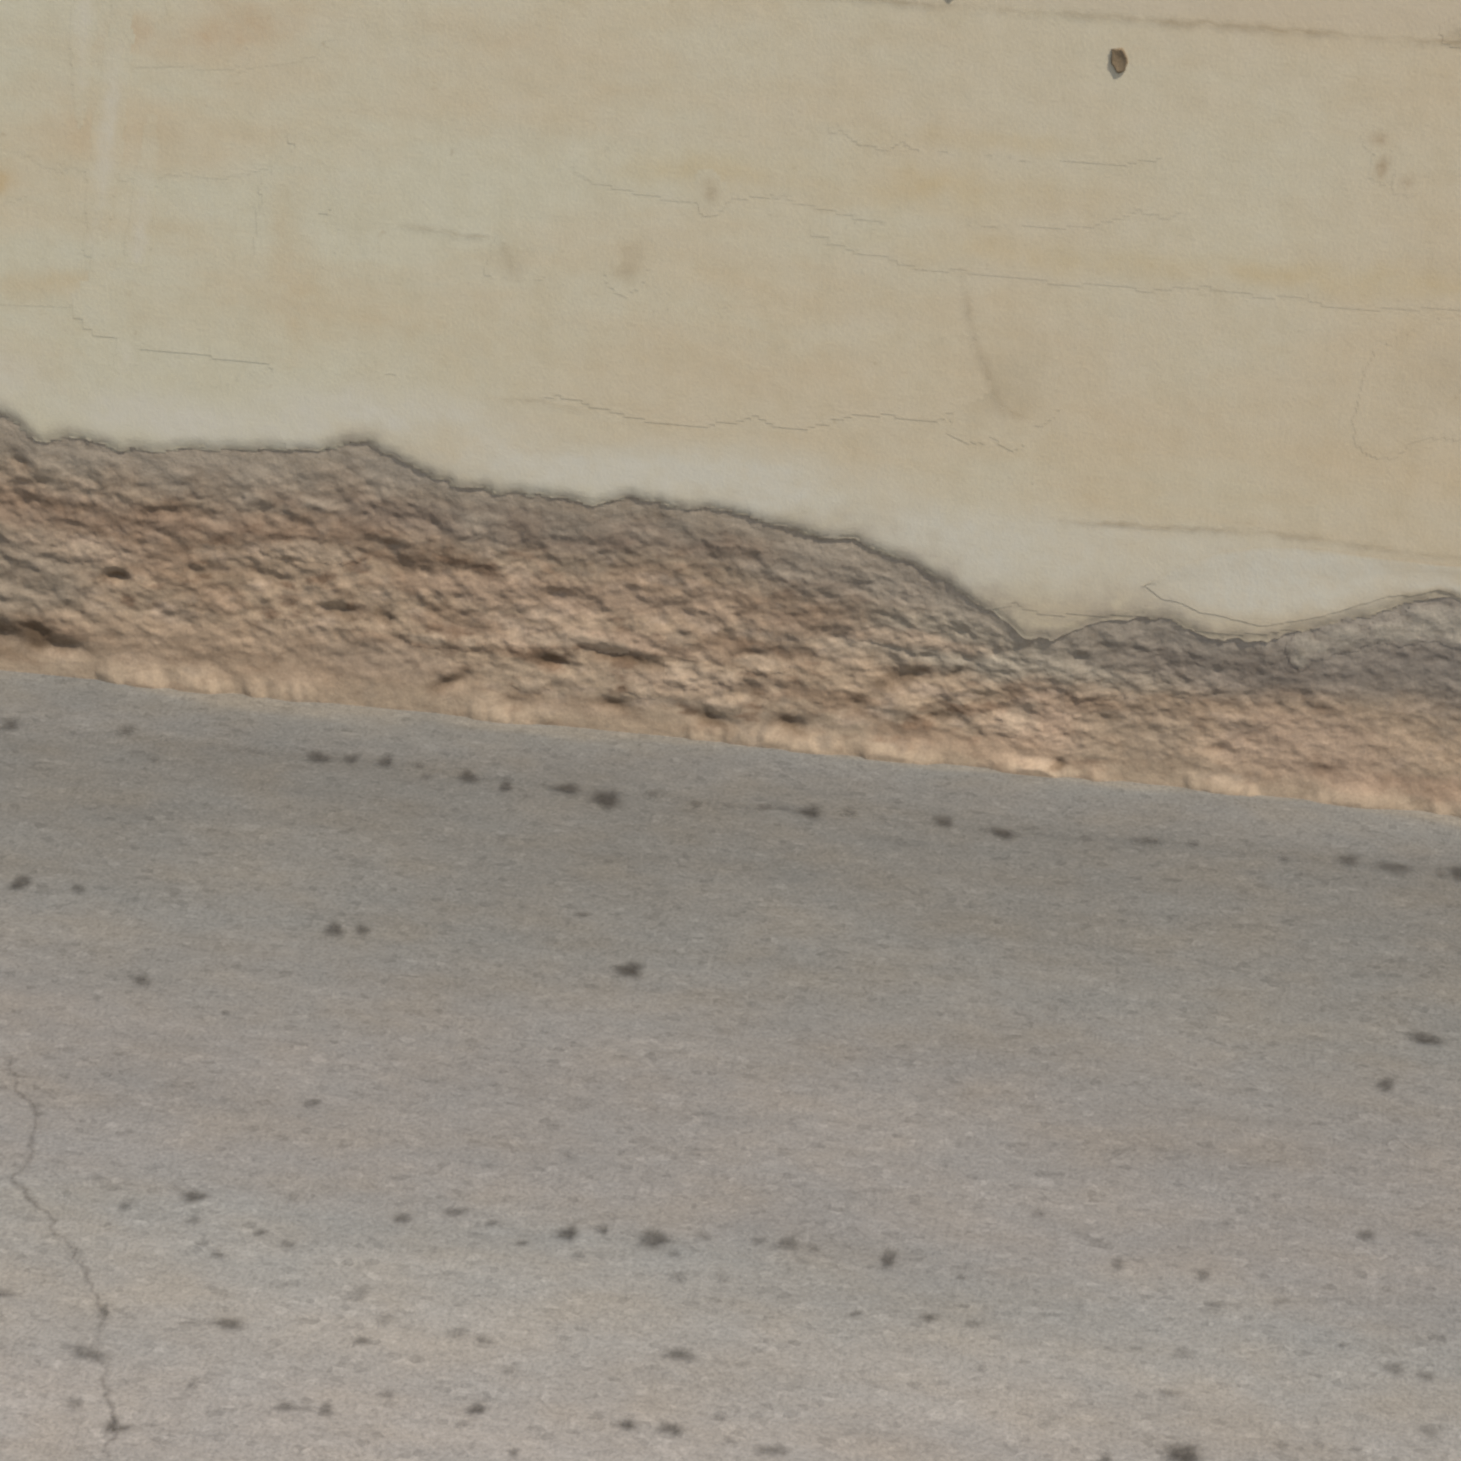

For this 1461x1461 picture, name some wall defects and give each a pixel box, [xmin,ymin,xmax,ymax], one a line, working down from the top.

flaking render [0,416,1461,818]